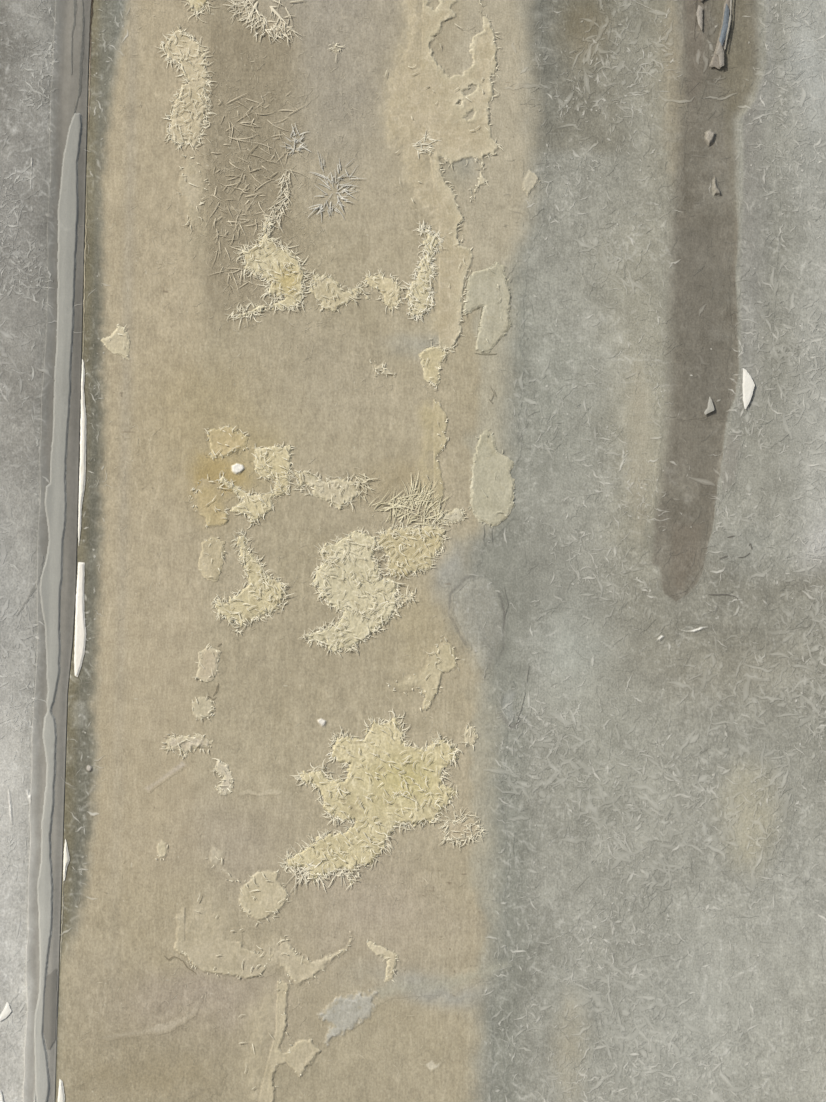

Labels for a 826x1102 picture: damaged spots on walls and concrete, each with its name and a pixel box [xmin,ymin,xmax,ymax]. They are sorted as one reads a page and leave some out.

peeling [26,0,552,1102]
damp [616,0,765,604]
spalling [0,1002,12,1021]